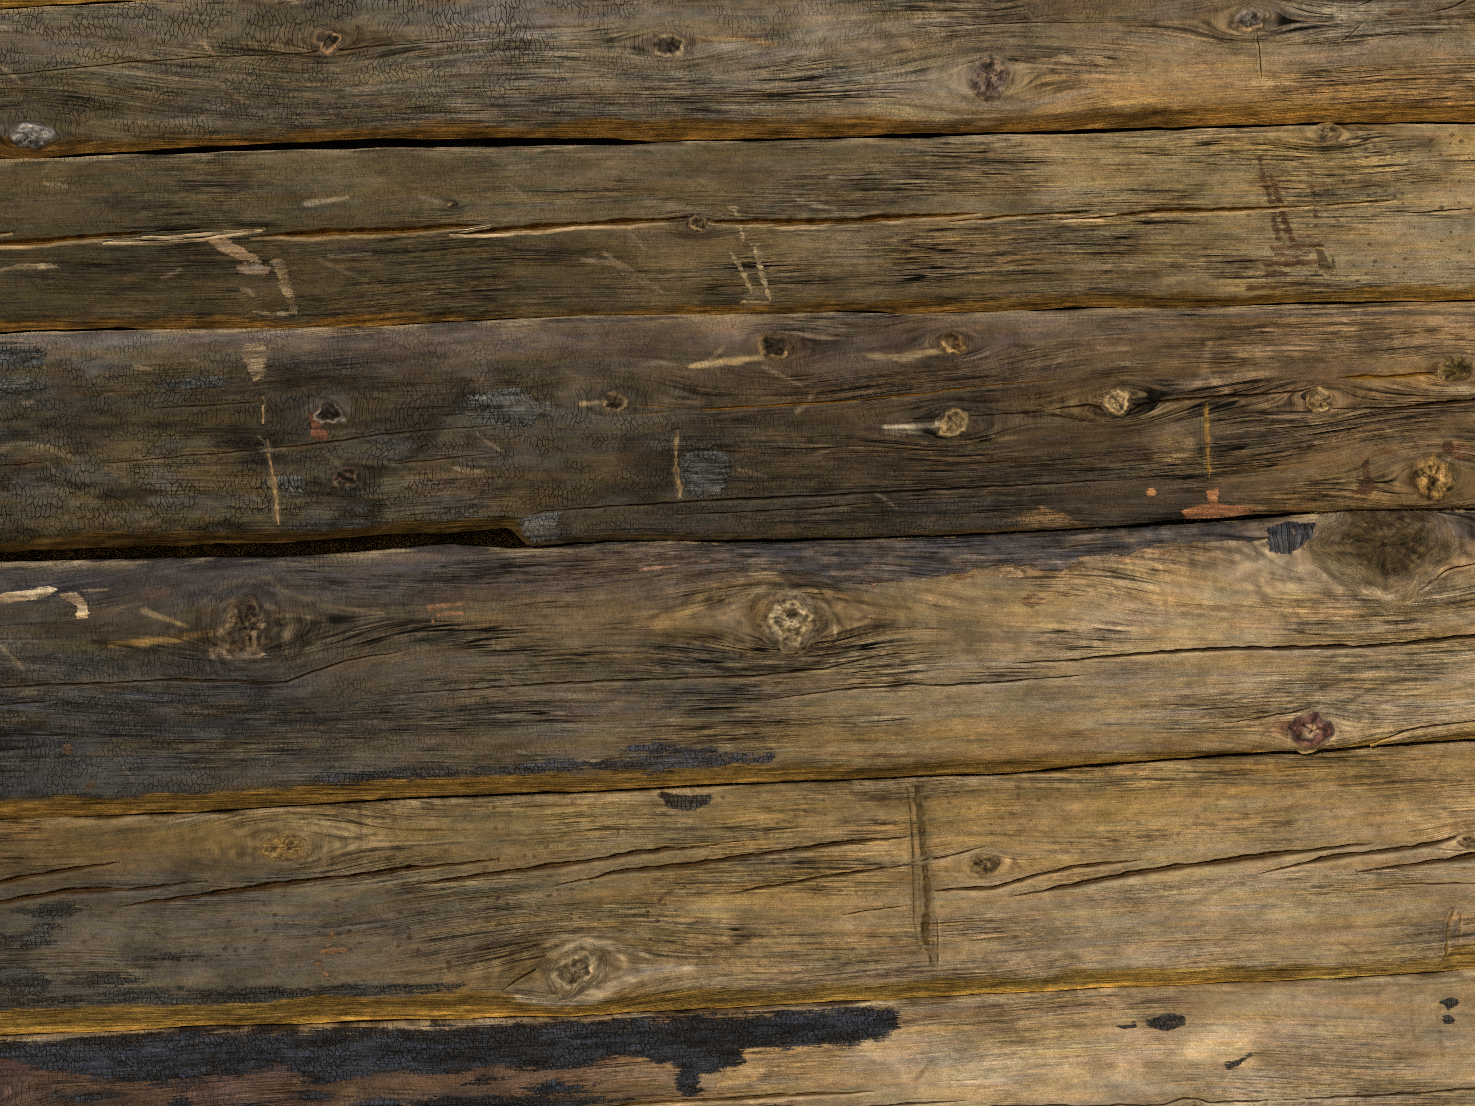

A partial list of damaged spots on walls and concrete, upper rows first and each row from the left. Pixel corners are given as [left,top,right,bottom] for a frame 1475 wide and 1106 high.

corrosion [1181,489,1258,519]
crack [0,832,1475,917]
peeling [715,1041,846,1090]